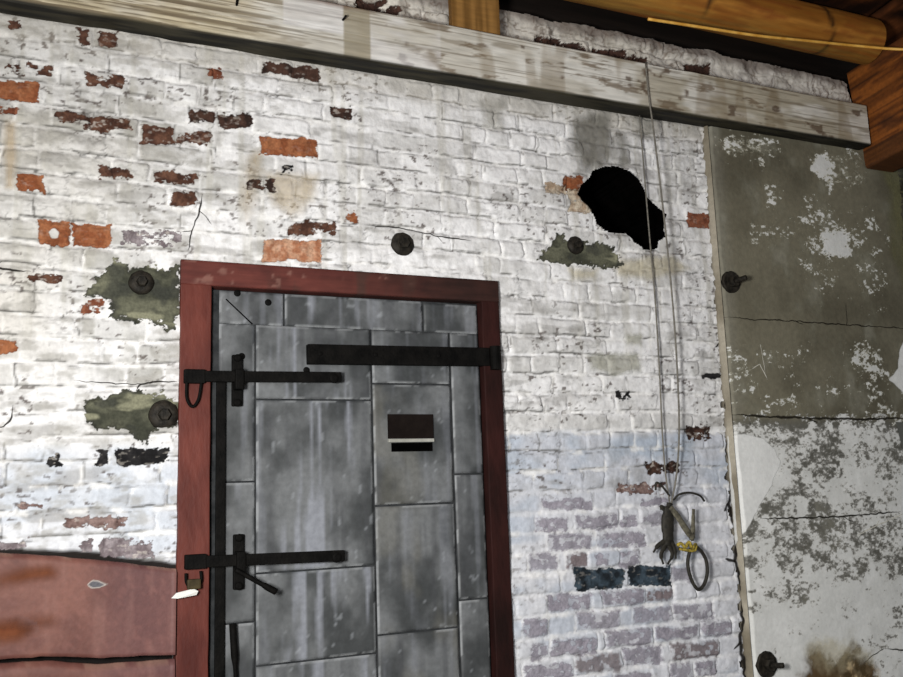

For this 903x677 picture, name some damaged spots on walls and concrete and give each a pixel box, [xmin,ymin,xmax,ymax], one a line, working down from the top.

peeling [54,109,253,146]
peeling [246,136,318,193]
peeling [37,219,182,248]
crack [182,197,212,247]
peeling [261,219,337,263]
spalling [545,166,667,250]
flaking render [81,257,180,332]
crack [724,311,903,329]
flaking render [83,389,178,467]
crack [724,404,903,423]
peeling [702,340,903,677]
corrosion [806,647,875,677]